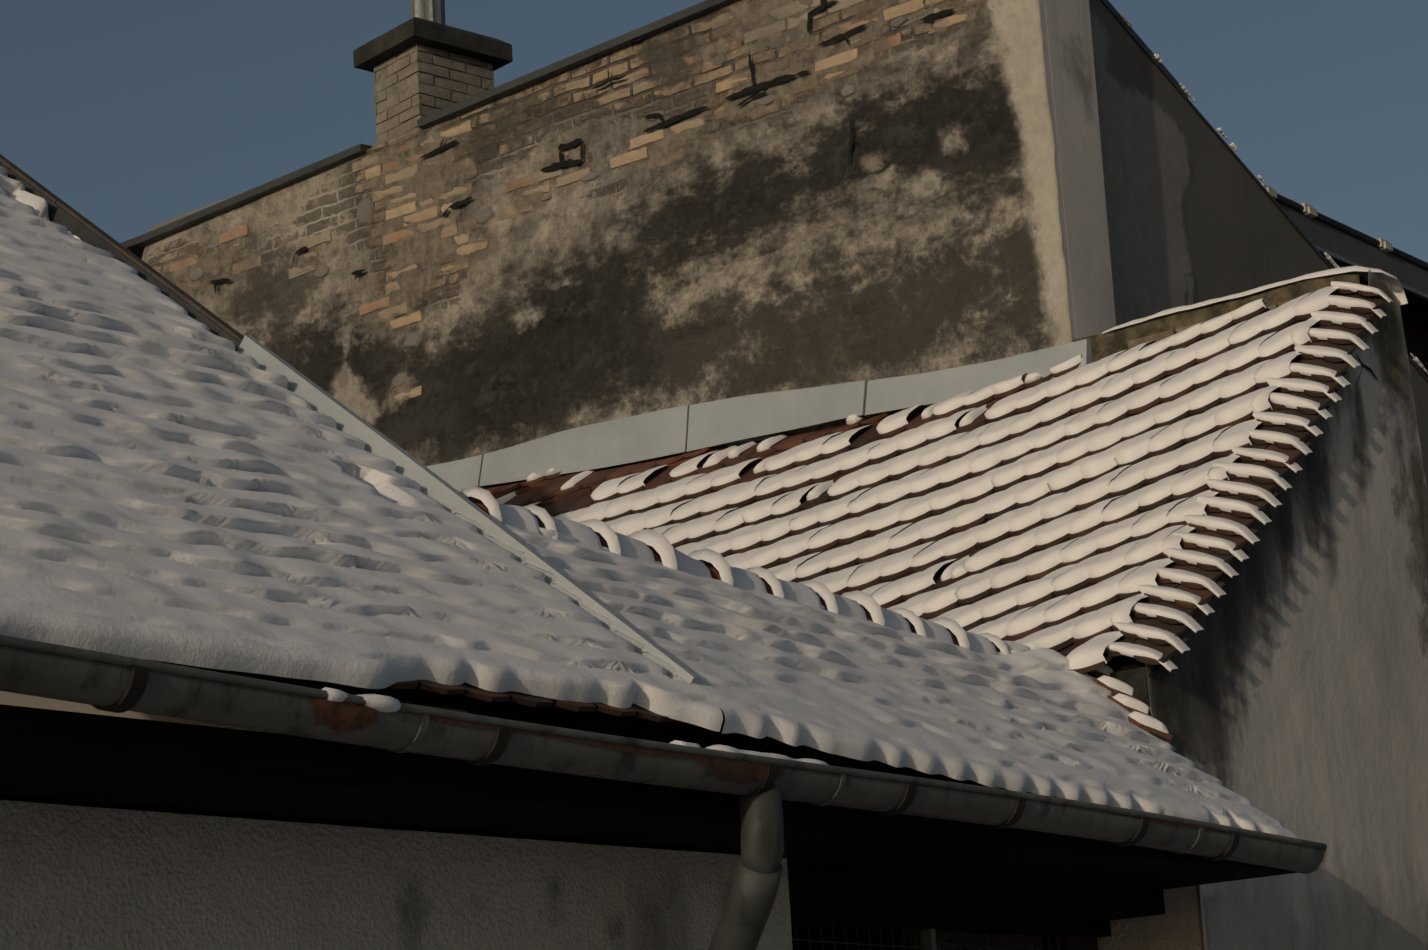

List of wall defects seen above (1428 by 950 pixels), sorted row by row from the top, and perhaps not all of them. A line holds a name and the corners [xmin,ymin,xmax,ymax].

spalling [352,0,991,349]
leakage [812,78,1020,185]
spalling [289,231,332,279]
leakage [301,329,367,389]
spalling [383,372,422,411]
leakage [455,257,645,429]
leakage [1147,378,1366,780]
corrosion [310,698,377,735]